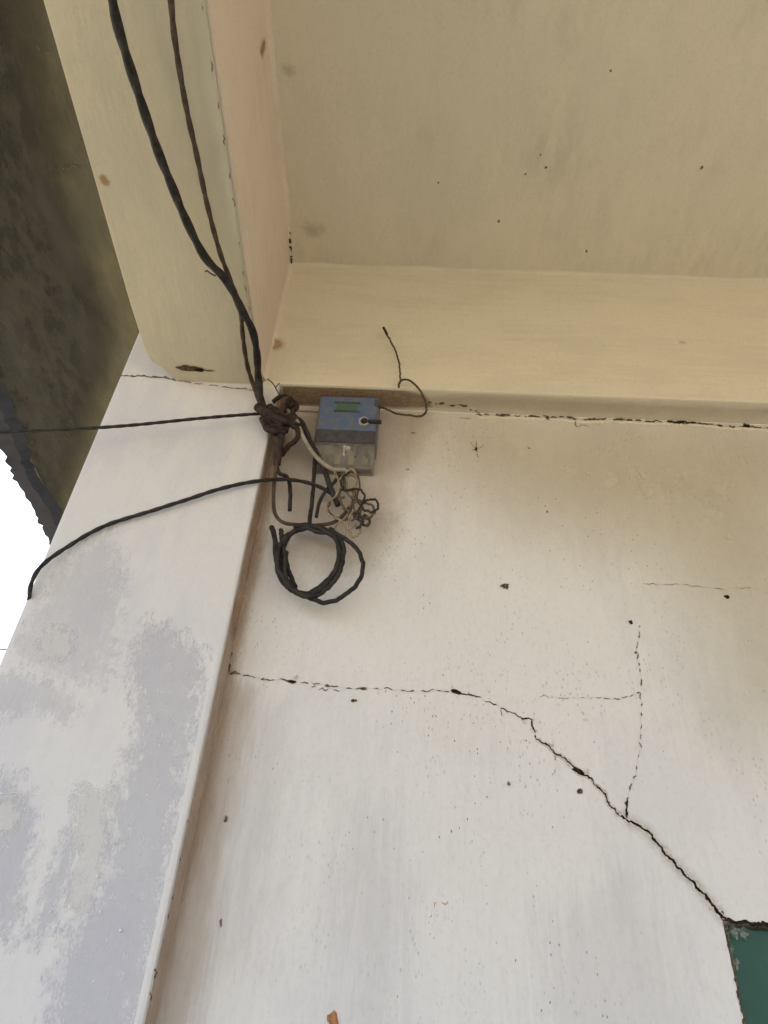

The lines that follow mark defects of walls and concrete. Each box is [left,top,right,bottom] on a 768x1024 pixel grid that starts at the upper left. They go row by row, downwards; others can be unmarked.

crack [428,401,768,432]
crack [228,598,728,920]
peeling [719,911,756,971]